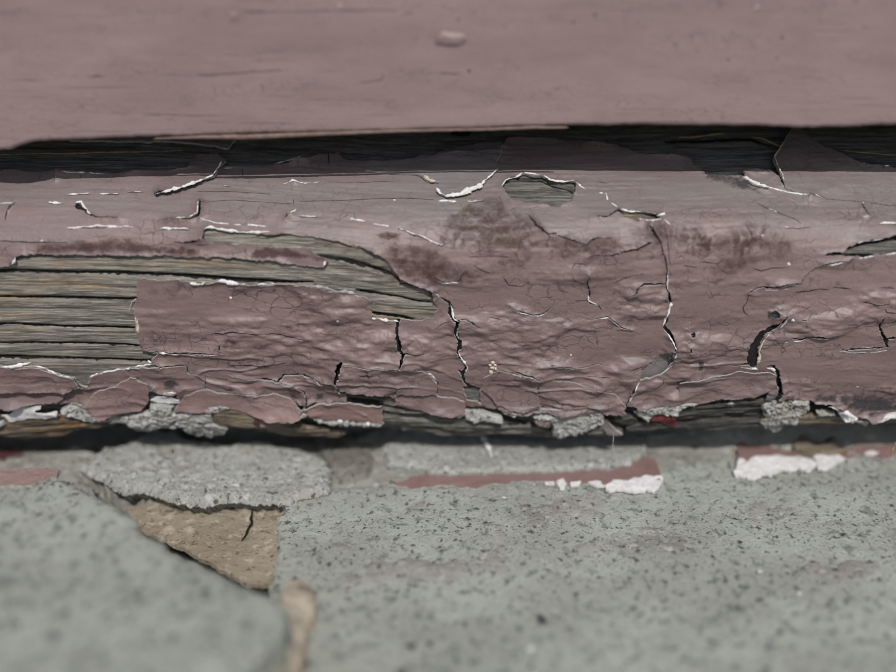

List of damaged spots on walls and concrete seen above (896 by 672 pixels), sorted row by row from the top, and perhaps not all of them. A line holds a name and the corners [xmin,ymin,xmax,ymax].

crack [161,167,447,247]
peeling [365,142,502,202]
peeling [502,172,585,207]
crack [744,176,824,229]
peeling [796,235,896,285]
peeling [0,225,481,428]
crack [170,332,375,409]
crack [395,318,405,366]
crack [434,222,722,387]
peeling [678,371,778,404]
crack [735,267,896,394]
peeling [831,407,858,424]